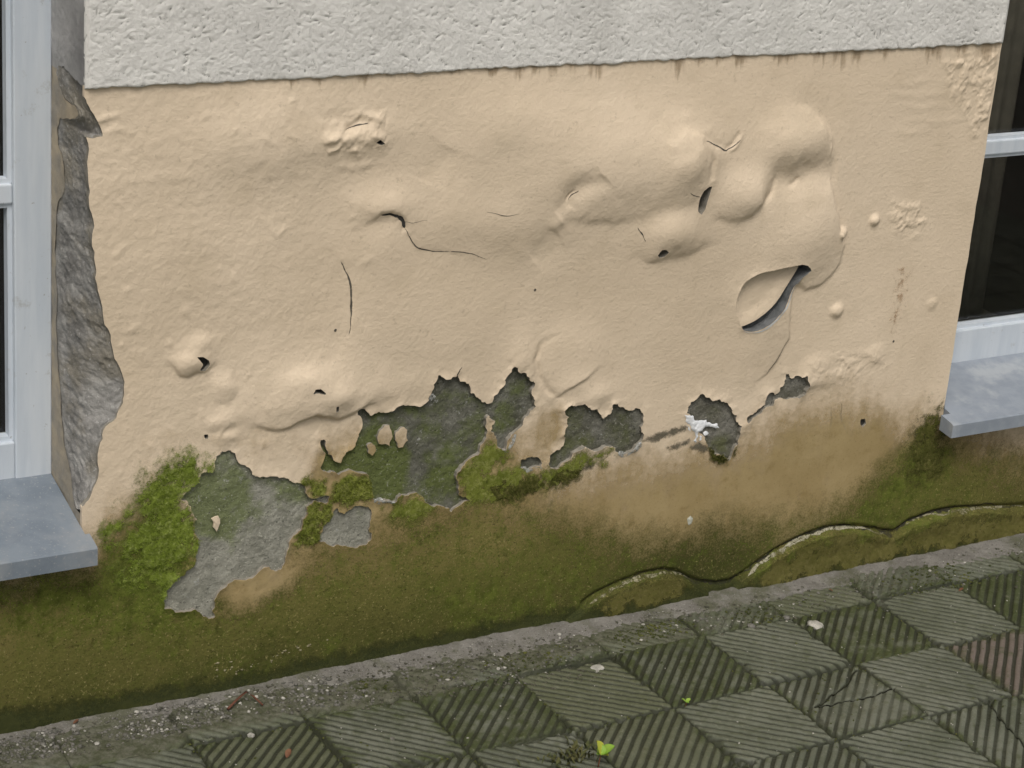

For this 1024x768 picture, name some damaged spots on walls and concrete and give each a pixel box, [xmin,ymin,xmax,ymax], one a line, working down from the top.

crack [382,213,485,259]
flaking render [55,66,124,510]
crack [341,263,352,333]
peeling [520,404,644,473]
peeling [687,374,810,460]
water stain [51,501,154,584]
peeling [164,367,536,619]
water stain [210,406,1024,619]
crack [587,502,1024,604]
water stain [0,580,767,734]